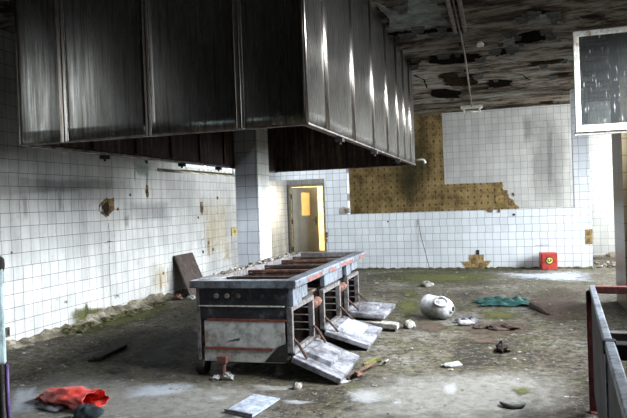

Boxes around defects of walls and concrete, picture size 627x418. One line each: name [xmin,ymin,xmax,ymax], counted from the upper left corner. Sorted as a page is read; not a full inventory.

spalling [429,28,558,65]
spalling [529,59,568,69]
spalling [430,72,513,100]
peeling [339,113,519,216]
spalling [99,198,119,217]